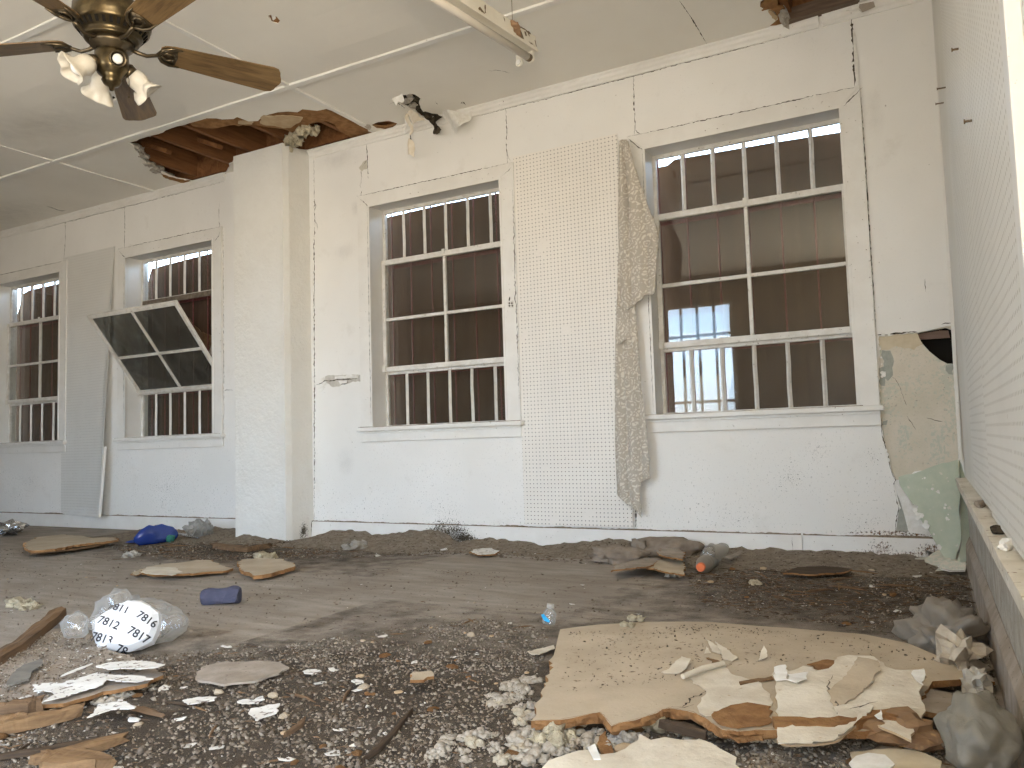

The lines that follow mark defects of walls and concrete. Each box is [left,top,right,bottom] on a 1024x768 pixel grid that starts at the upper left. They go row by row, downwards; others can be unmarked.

flaking render [876,326,958,521]